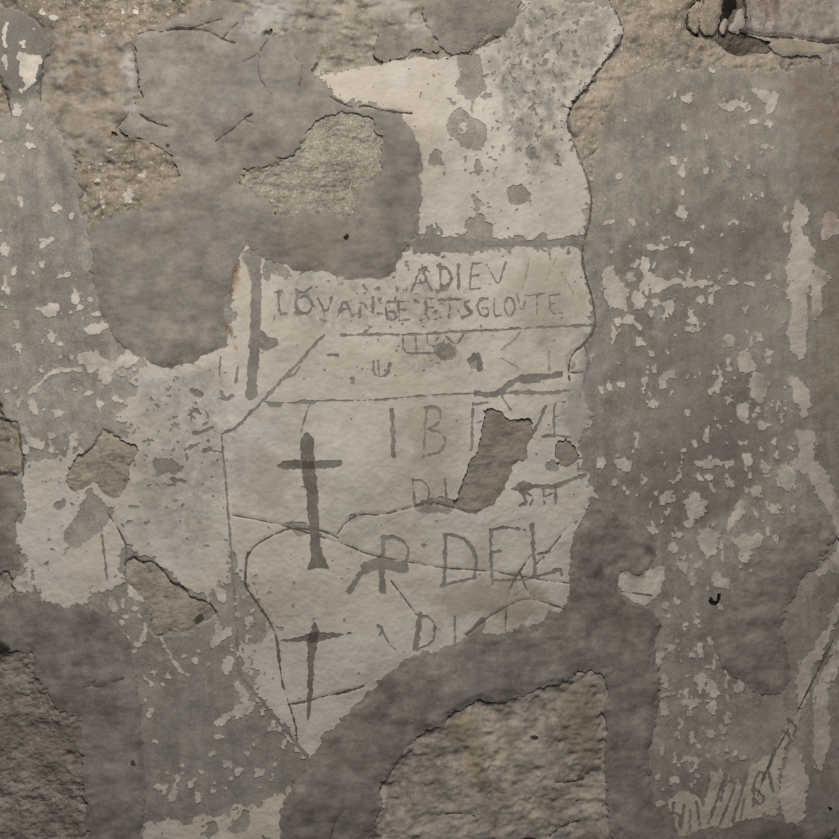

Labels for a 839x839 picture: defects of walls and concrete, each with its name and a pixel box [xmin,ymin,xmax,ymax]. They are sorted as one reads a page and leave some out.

peeling [225,0,820,240]
crack [739,29,839,50]
peeling [598,236,755,408]
peeling [765,200,832,360]
peeling [821,211,839,241]
peeling [0,246,598,759]
peeling [596,432,639,472]
peeling [647,330,839,586]
peeling [618,565,681,618]
spalling [0,650,91,839]
peeling [153,763,204,803]
spalling [368,669,613,839]